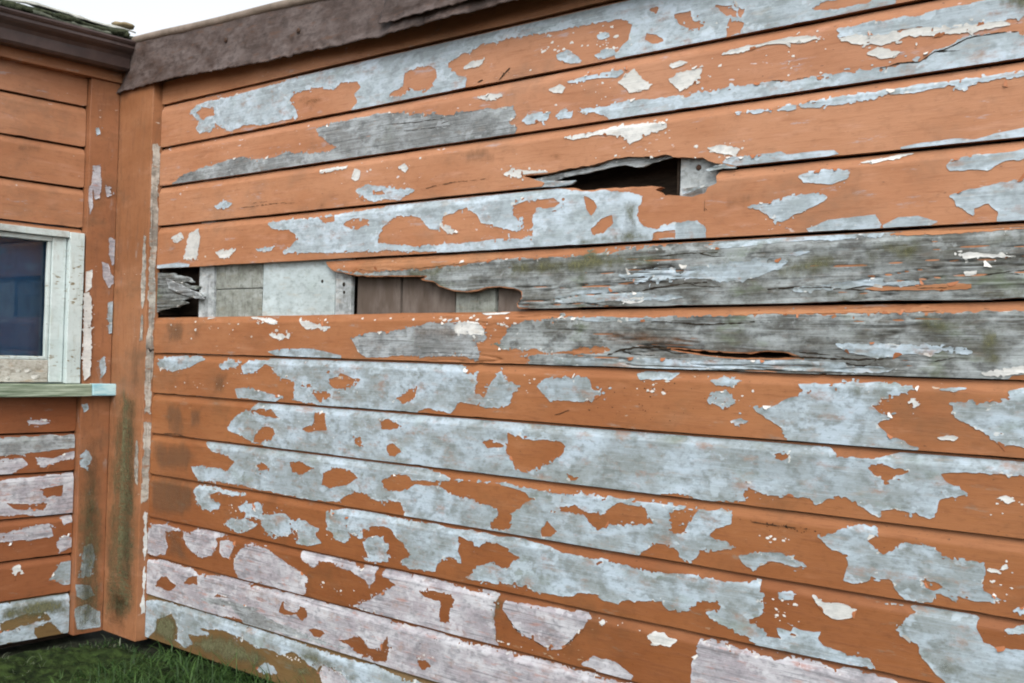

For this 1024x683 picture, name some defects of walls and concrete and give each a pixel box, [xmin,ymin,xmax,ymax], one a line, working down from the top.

peeling [88,165,114,213]
peeling [172,0,1024,304]
peeling [81,237,115,380]
peeling [134,143,1024,683]
crack [607,321,755,356]
peeling [0,418,101,645]